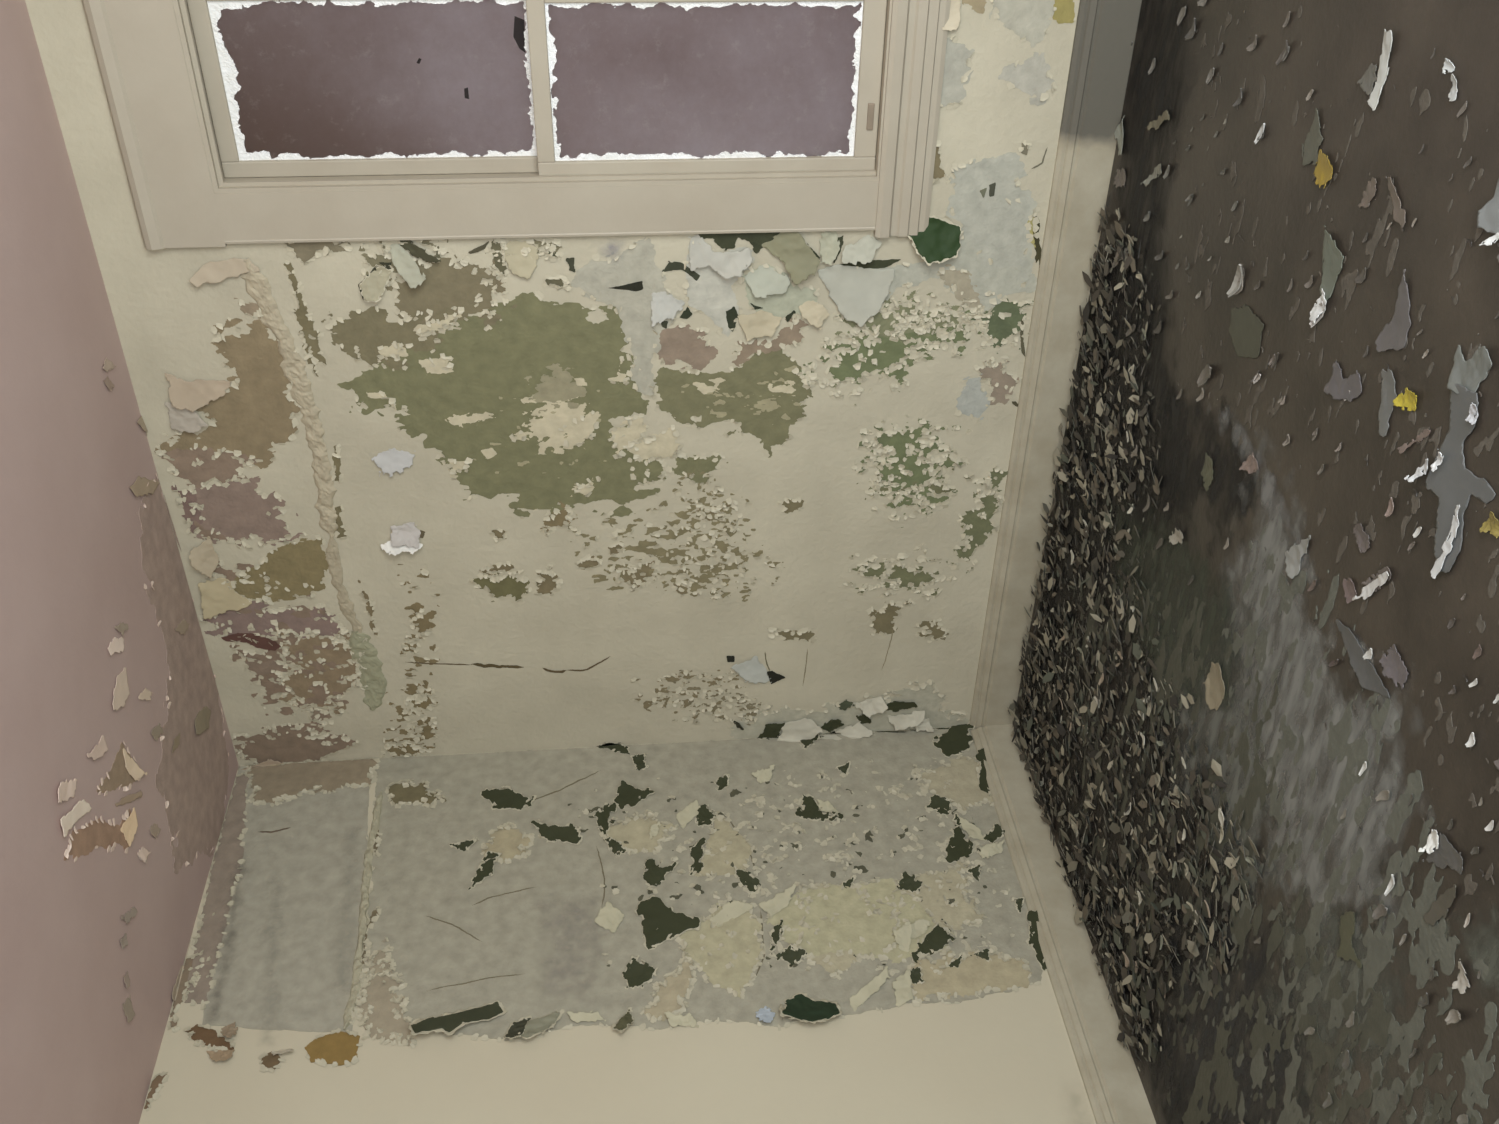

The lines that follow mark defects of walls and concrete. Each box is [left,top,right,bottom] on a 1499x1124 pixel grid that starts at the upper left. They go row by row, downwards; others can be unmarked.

flaking render [940,0,1077,110]
peeling [1357,29,1393,111]
peeling [1442,58,1458,101]
peeling [1301,108,1333,189]
peeling [1477,179,1499,262]
peeling [1319,225,1344,301]
peeling [1375,269,1499,573]
water stain [1020,0,1305,1124]
peeling [1285,535,1311,579]
peeling [58,140,1047,1073]
peeling [1204,662,1225,711]
peeling [1336,619,1409,698]